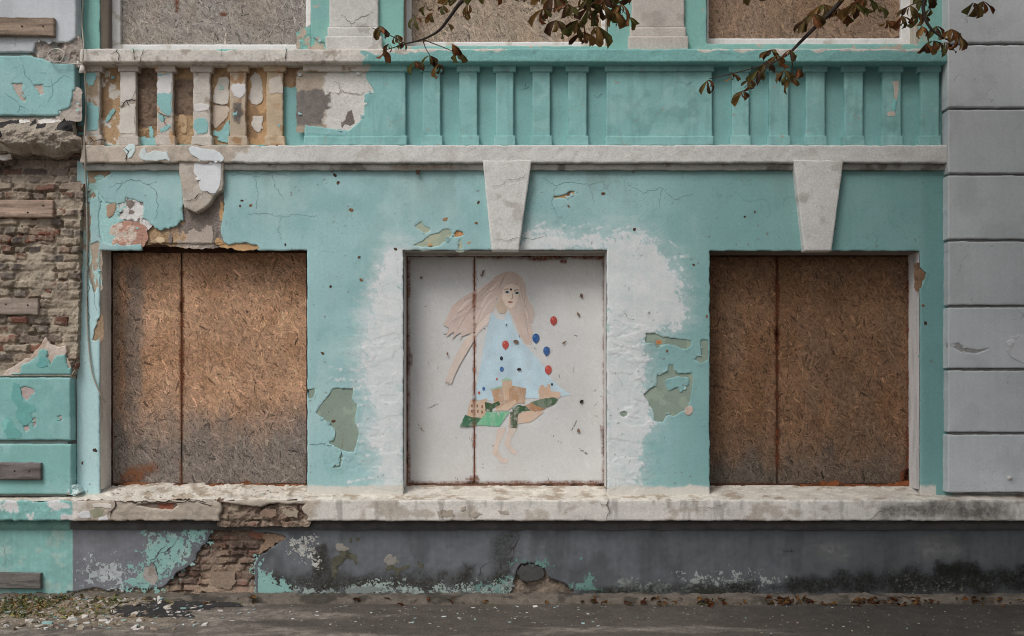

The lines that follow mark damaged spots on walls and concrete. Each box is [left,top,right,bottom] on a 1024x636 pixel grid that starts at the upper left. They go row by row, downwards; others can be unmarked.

flaking render [0,36,374,439]
peeling [414,217,471,252]
peeling [644,333,708,422]
peeling [309,388,359,468]
rust [120,465,155,486]
flaking render [68,497,795,594]
water stain [773,562,1024,594]